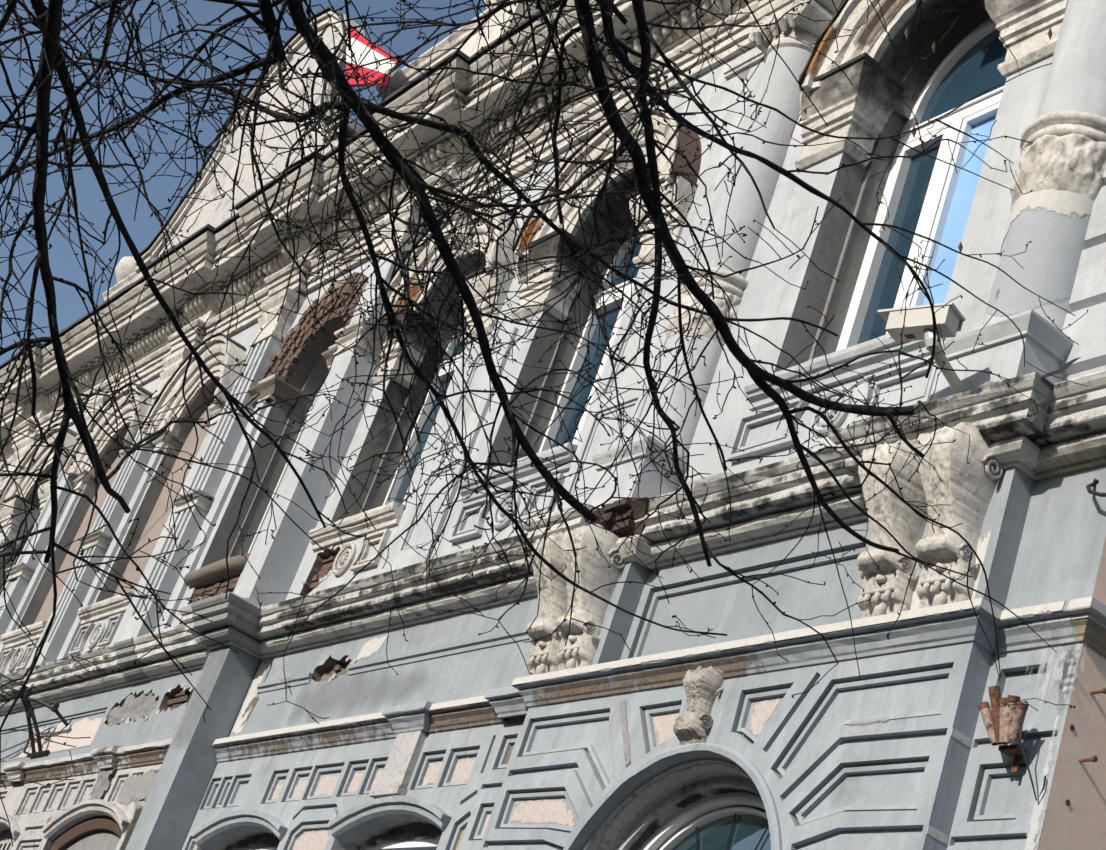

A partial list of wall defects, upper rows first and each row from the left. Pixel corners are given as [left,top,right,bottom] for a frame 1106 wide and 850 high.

peeling [1000,188,1094,253]
damp [693,375,1106,520]
damp [277,532,533,631]
peeling [319,634,388,683]
peeling [511,598,1065,686]
flaking render [156,683,193,714]
peeling [214,661,385,744]
peeling [430,695,489,710]
corrosion [978,686,1029,711]